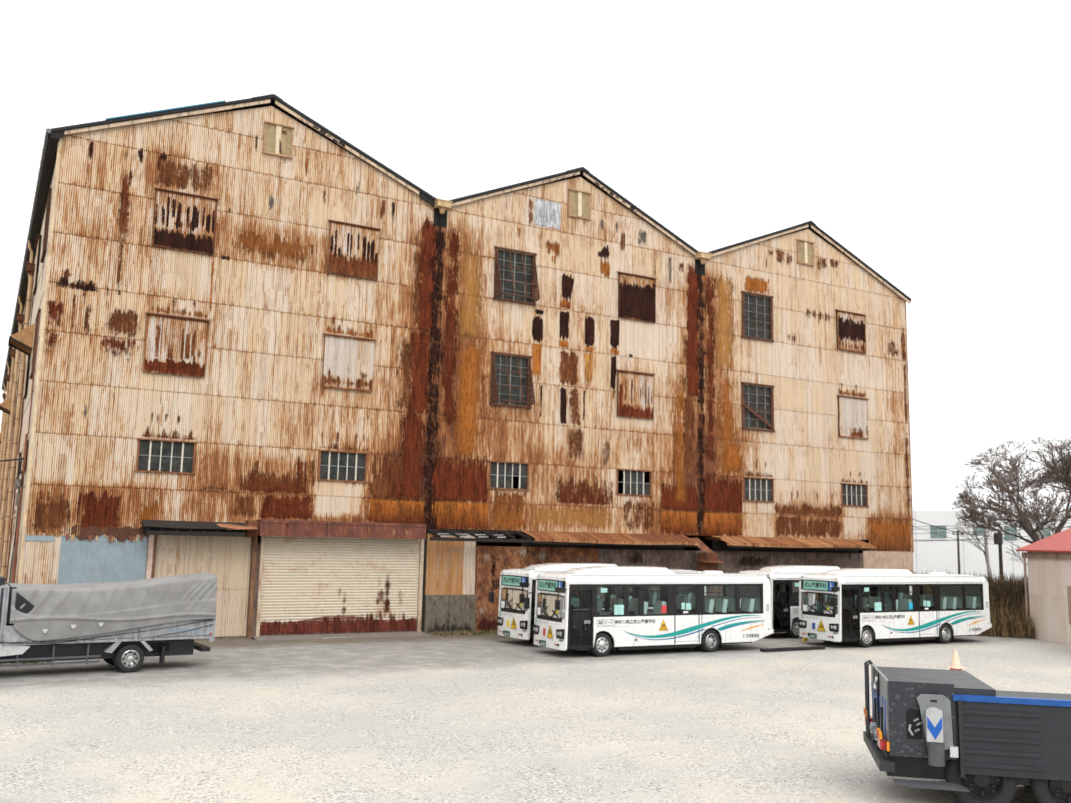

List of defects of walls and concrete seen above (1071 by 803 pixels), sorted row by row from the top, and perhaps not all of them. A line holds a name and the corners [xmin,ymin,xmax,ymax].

rust [46,171,133,350]
rust [151,152,313,317]
rust [101,309,137,356]
rust [144,325,205,376]
rust [322,218,792,537]
rust [806,310,865,352]
rust [0,352,121,583]
rust [204,456,316,520]
rust [775,491,842,538]
rust [261,580,416,634]